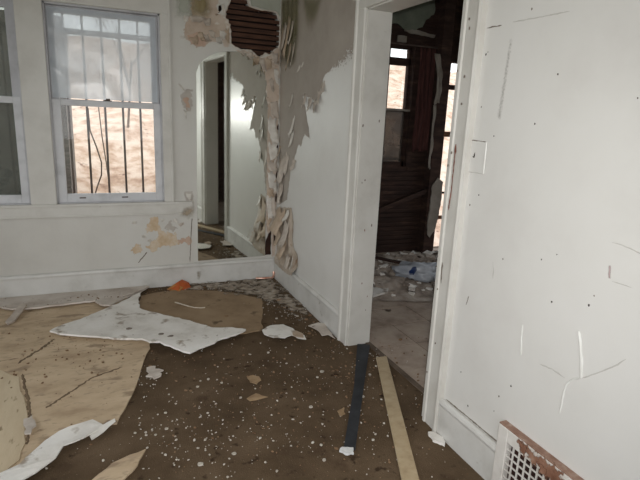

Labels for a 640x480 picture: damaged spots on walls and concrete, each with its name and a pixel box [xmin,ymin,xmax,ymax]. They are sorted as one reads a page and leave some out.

peeling [178,0,356,257]
peeling [131,217,192,255]
crack [540,331,626,414]
rust [517,439,564,480]